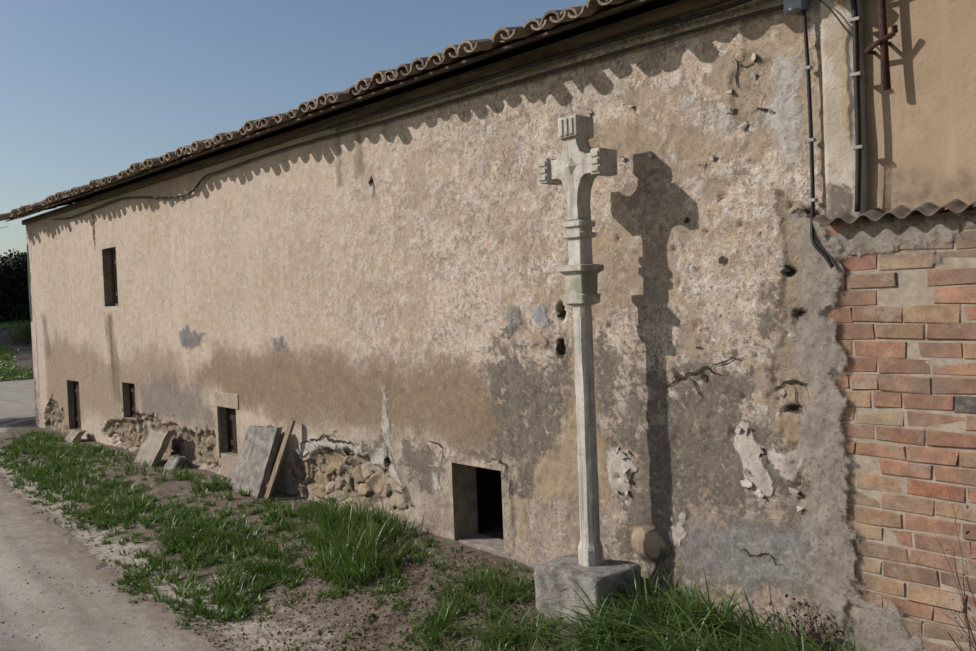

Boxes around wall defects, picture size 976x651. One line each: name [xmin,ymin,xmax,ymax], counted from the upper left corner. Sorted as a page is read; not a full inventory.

damp [46,319,576,517]
flaking render [511,321,579,541]
peeling [595,401,637,502]
damp [593,282,811,606]
crack [664,357,743,400]
peeling [733,420,804,512]
crack [774,379,808,406]
flaking render [767,189,821,423]